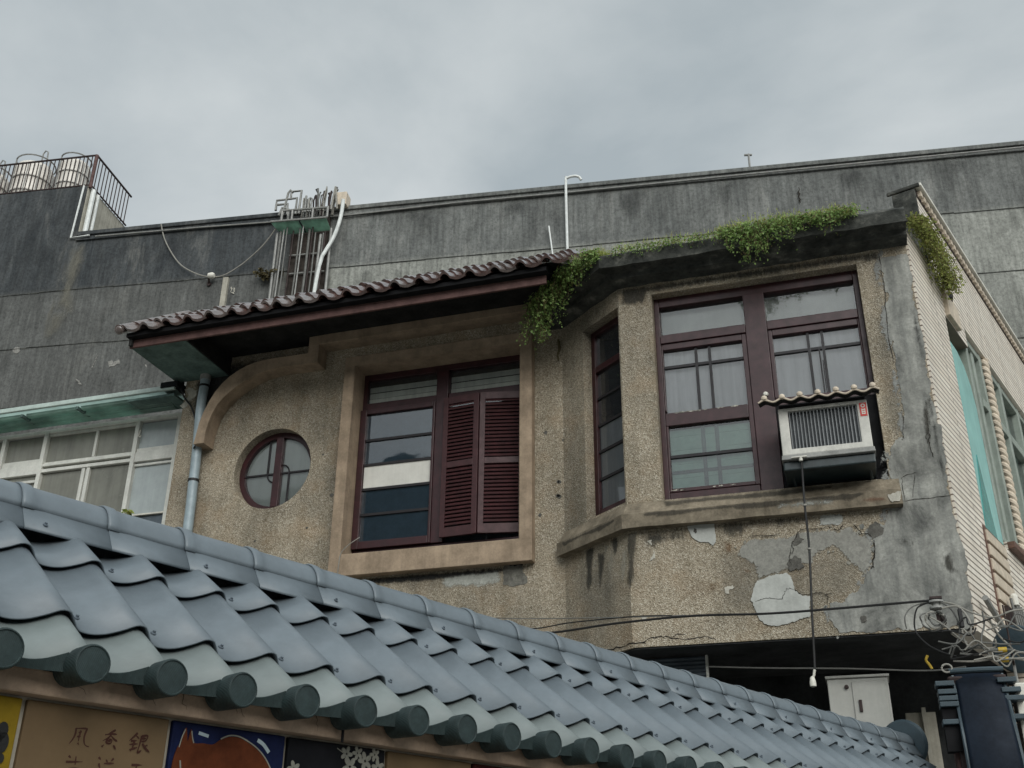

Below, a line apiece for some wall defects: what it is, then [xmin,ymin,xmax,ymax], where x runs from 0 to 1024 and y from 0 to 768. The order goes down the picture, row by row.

crack [879,257,894,362]
peeling [735,249,974,639]
crack [901,409,950,501]
water stain [586,532,683,588]